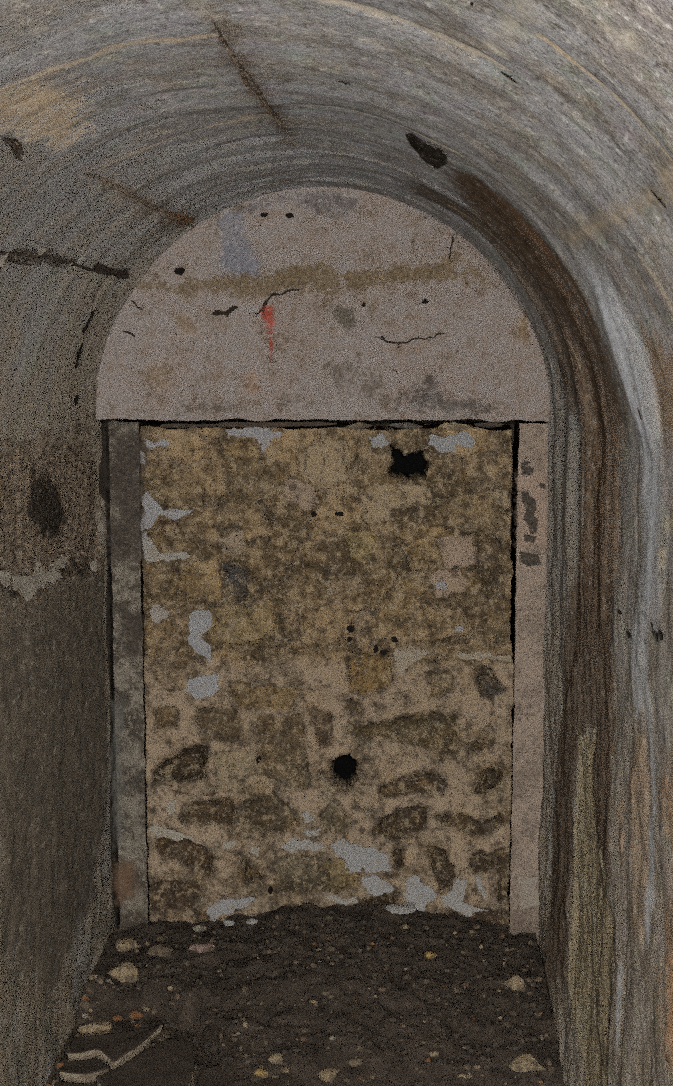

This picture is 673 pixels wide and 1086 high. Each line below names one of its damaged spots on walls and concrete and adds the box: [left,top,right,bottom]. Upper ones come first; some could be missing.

crack [212,18,284,130]
spalling [406,133,448,169]
crack [0,249,142,337]
spalling [0,421,105,616]
peeling [345,858,394,896]